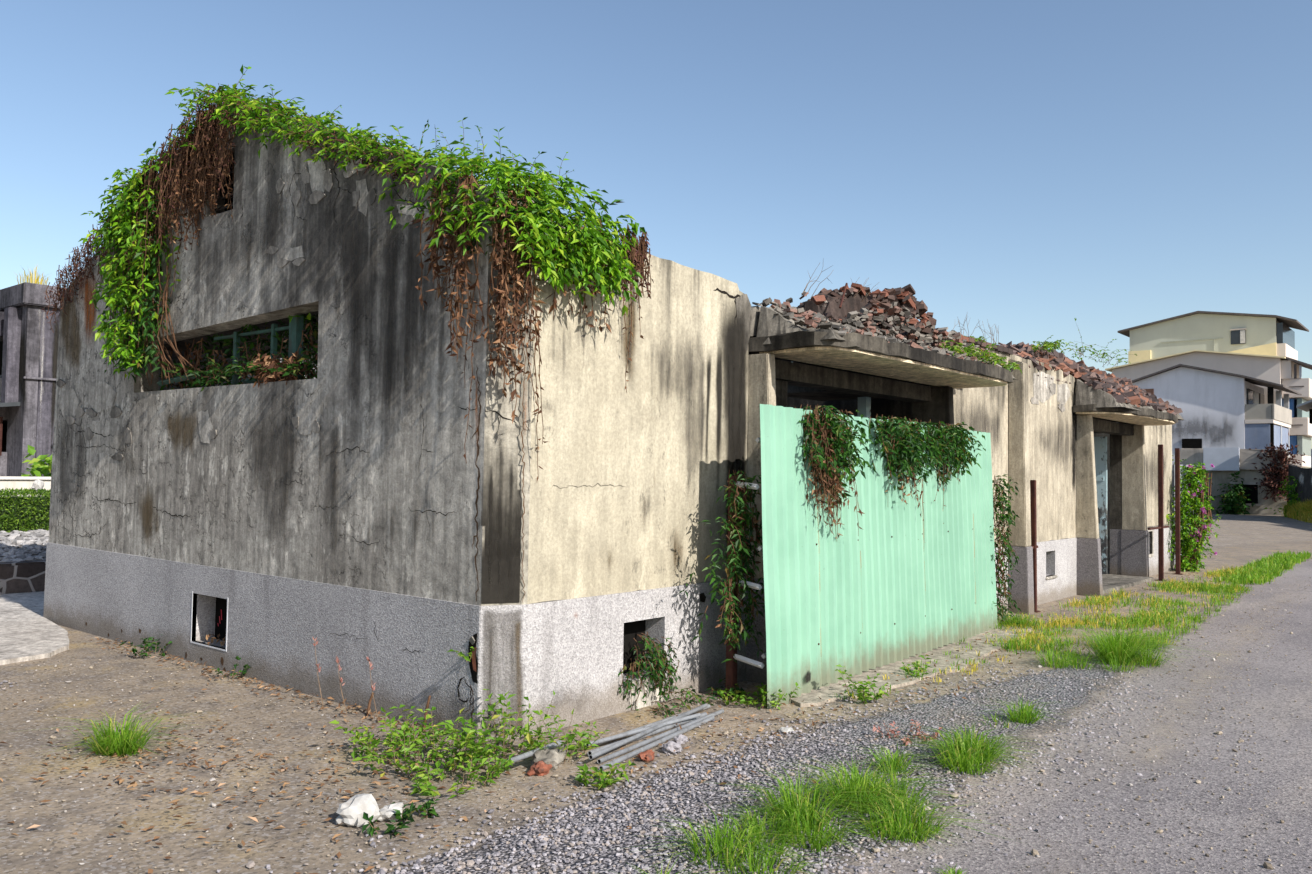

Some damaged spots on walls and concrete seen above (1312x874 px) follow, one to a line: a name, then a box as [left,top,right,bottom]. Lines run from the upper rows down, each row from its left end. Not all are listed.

rust [83,279,95,335]
crack [58,388,190,544]
water stain [699,313,746,536]
water stain [1172,421,1232,442]
water stain [481,453,522,730]